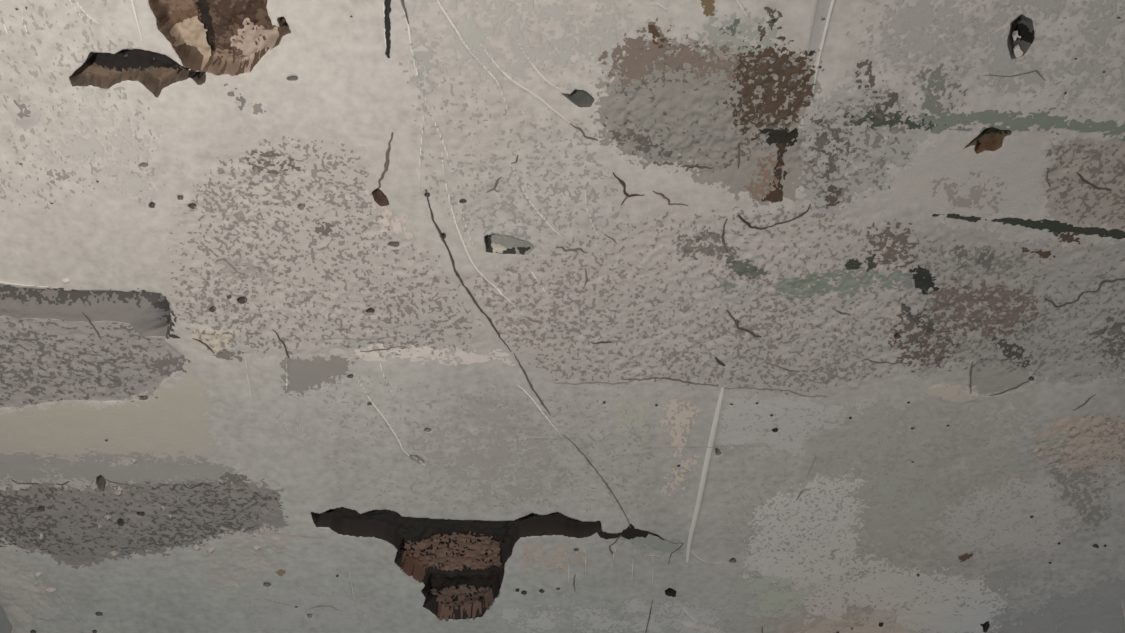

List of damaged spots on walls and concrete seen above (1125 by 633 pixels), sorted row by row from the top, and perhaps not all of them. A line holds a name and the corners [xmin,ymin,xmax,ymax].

crack [384,0,409,58]
crack [377,132,393,189]
crack [486,155,518,193]
flaking render [0,0,1125,465]
crack [571,124,598,141]
corrosion [598,18,824,141]
leakage [401,0,1125,208]
corrosion [744,151,783,203]
leakage [932,171,1125,239]
spalling [311,507,602,622]